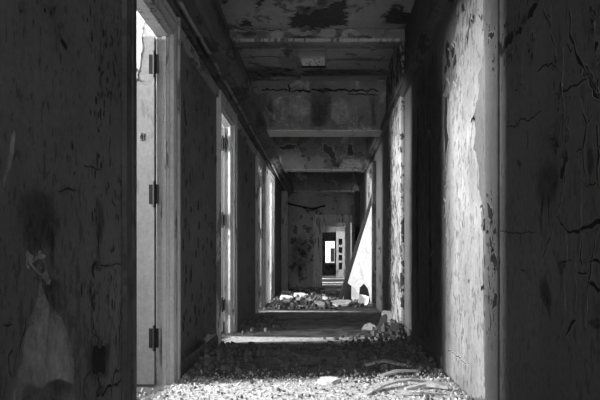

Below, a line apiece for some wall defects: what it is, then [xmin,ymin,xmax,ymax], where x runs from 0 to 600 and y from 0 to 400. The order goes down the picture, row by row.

peeling [270,0,364,38]
peeling [380,4,411,25]
crack [537,1,600,99]
crack [258,84,378,96]
peeling [276,143,341,172]
peeling [441,0,541,399]
crack [565,124,600,326]